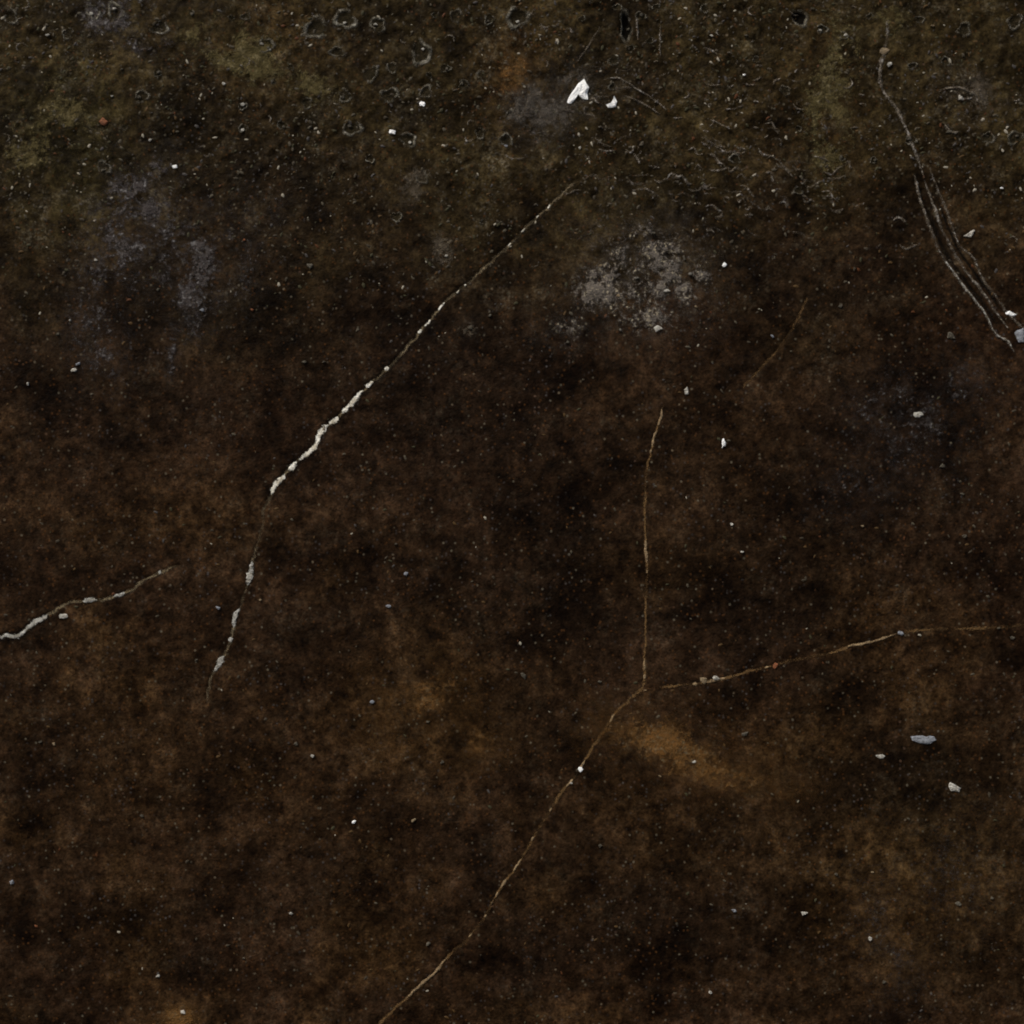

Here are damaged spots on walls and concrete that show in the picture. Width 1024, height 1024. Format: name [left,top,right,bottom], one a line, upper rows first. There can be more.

crack [262,184,572,512]
leakage [547,214,716,343]
crack [879,55,1024,352]
crack [0,567,172,641]
crack [207,546,257,698]
crack [378,409,1014,1024]